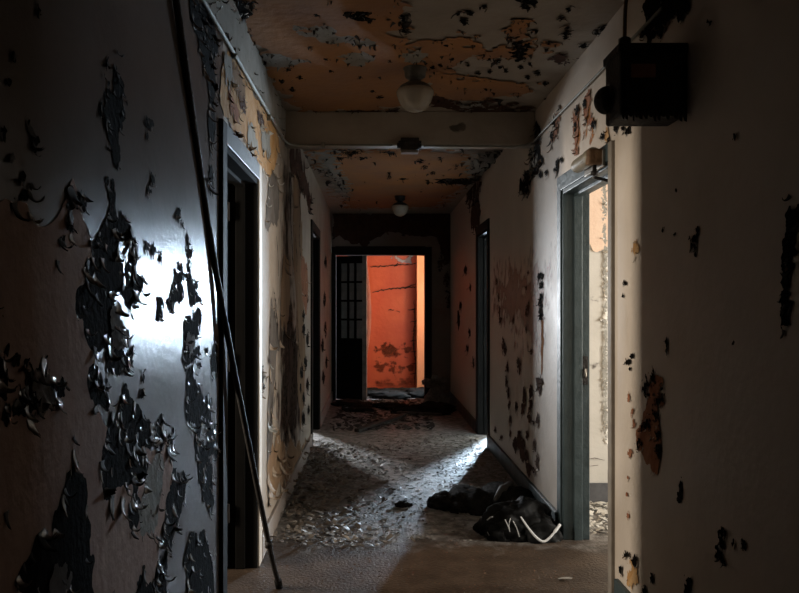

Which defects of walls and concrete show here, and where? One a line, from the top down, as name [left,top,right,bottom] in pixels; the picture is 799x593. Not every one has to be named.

peeling [571,89,631,156]
peeling [0,51,222,593]
peeling [190,0,589,507]
peeling [777,194,799,339]
peeling [627,367,665,476]